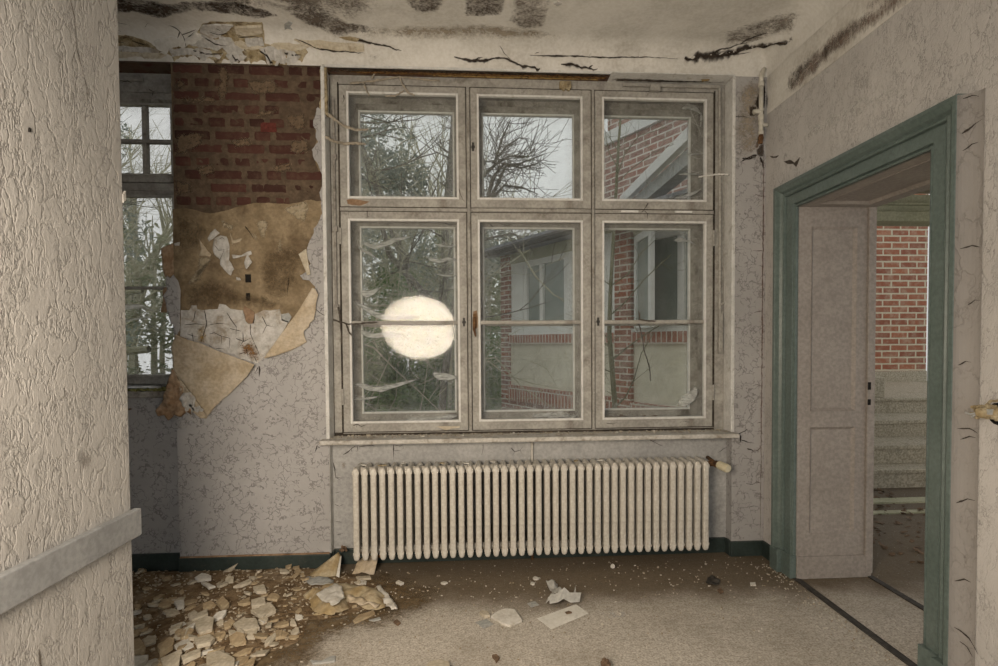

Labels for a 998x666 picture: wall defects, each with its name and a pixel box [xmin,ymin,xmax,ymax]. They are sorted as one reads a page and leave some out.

leakage [117,0,367,34]
leakage [399,0,547,36]
crack [455,46,674,72]
leakage [729,17,794,41]
leakage [788,0,901,89]
flaking render [168,24,328,363]
spalling [965,399,998,425]